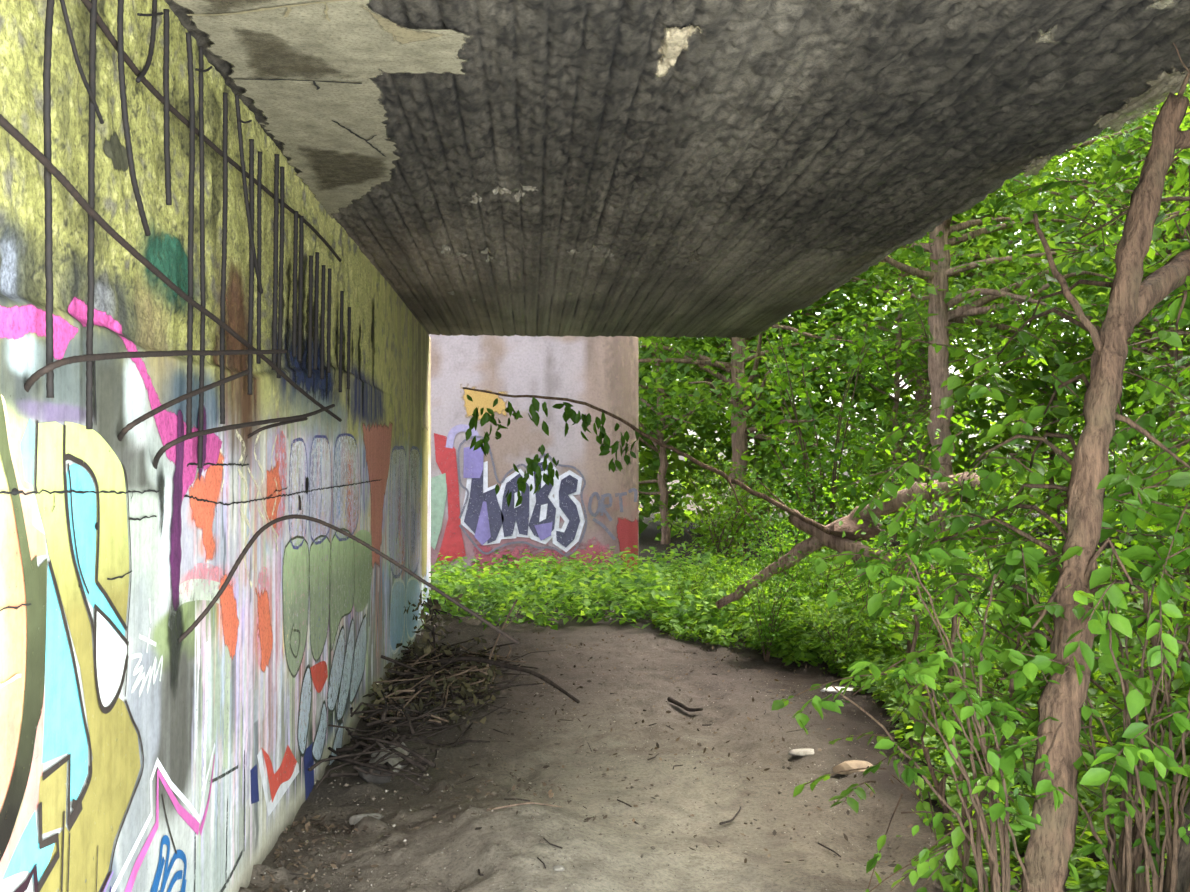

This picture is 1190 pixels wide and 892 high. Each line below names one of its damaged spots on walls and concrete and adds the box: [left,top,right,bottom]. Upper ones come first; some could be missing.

spalling [656,24,701,78]
spalling [0,0,470,384]
crack [0,455,382,521]